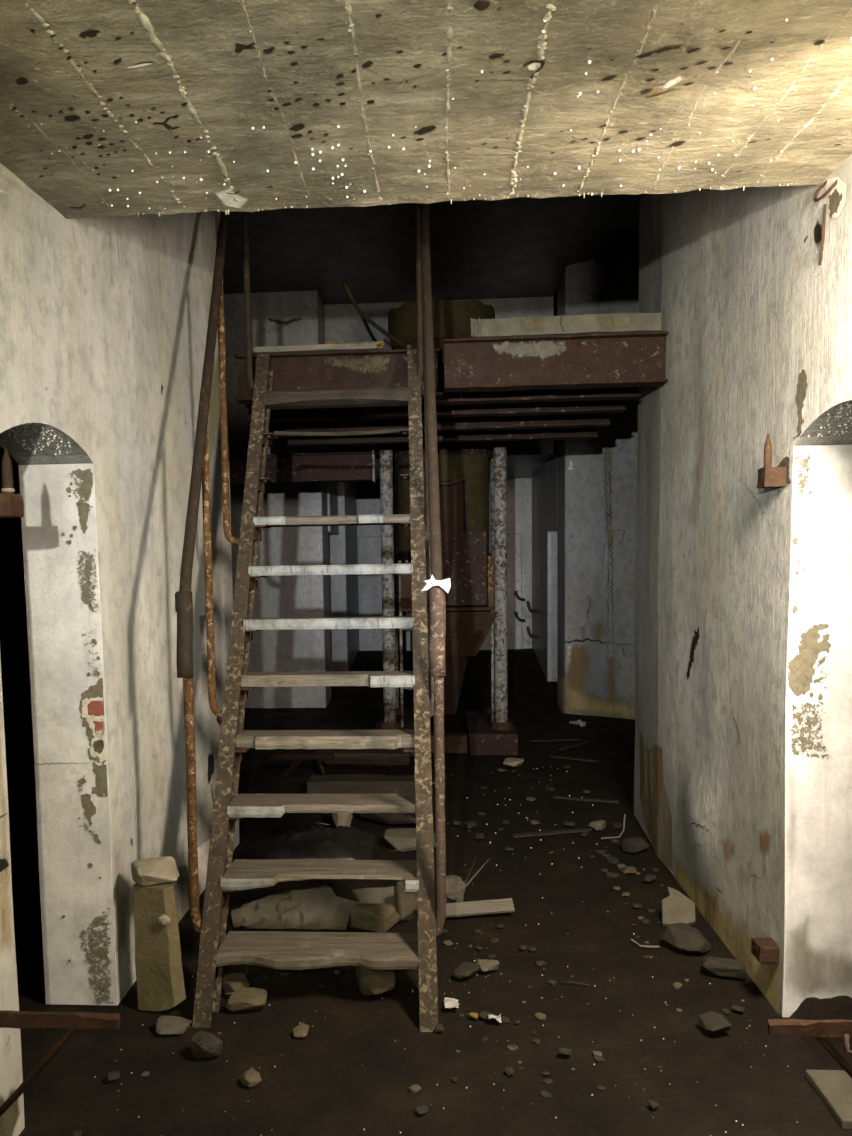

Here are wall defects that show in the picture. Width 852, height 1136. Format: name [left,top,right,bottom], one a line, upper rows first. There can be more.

damp [9,0,247,215]
damp [241,0,311,211]
damp [343,0,390,205]
damp [444,0,556,204]
damp [577,4,657,198]
damp [674,8,852,192]
spalling [804,176,847,246]
peeling [61,469,98,612]
crack [565,446,633,661]
spalling [76,626,108,844]
peeling [788,623,831,759]
peeling [68,908,113,1004]